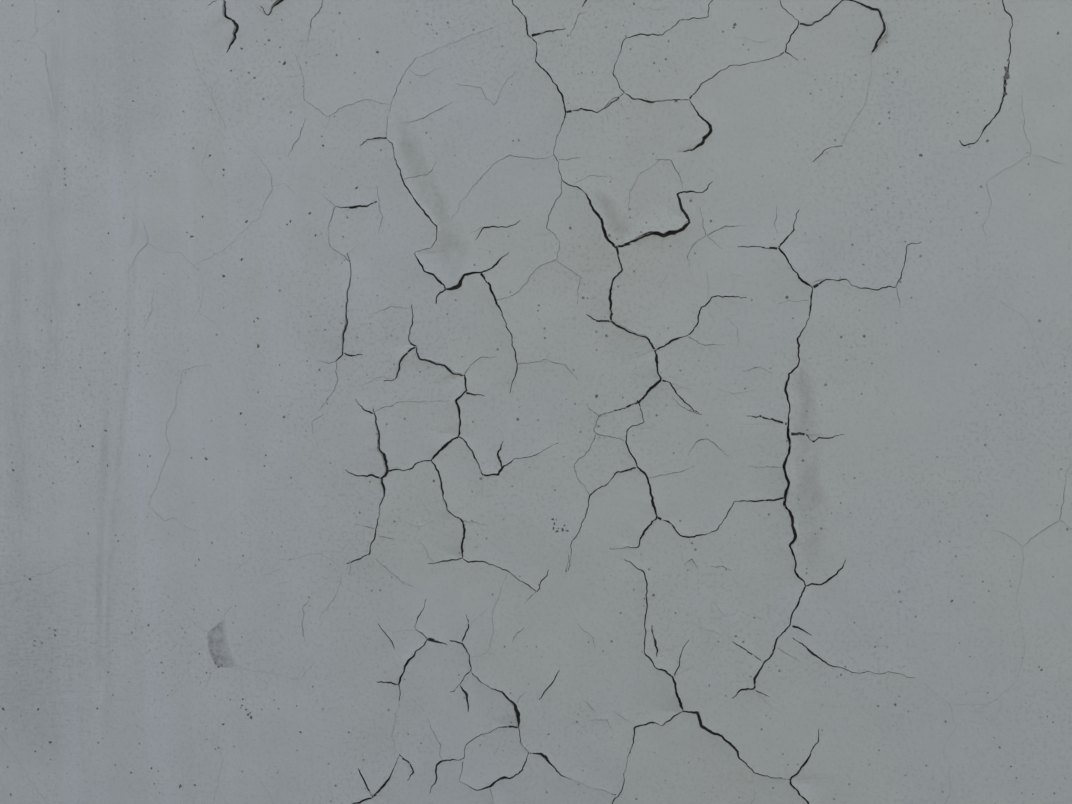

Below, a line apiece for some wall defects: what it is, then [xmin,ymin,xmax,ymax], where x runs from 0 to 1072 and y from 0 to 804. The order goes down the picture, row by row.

peeling [198,0,339,58]
crack [451,64,554,247]
crack [957,0,1069,243]
crack [648,205,746,298]
peeling [305,0,933,804]
crack [665,397,737,466]
crack [235,553,340,643]
crack [678,553,737,629]
crack [316,698,424,804]